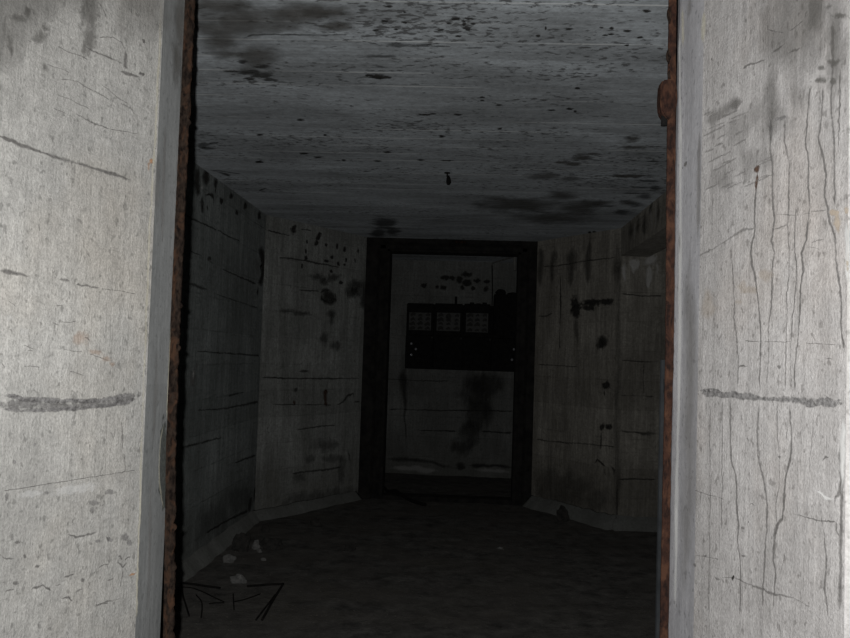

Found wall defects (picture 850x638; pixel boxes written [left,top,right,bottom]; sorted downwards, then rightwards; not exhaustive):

crack [90,37,138,77]
crack [0,136,127,180]
crack [731,27,841,386]
crack [836,263,844,347]
crack [716,407,843,607]